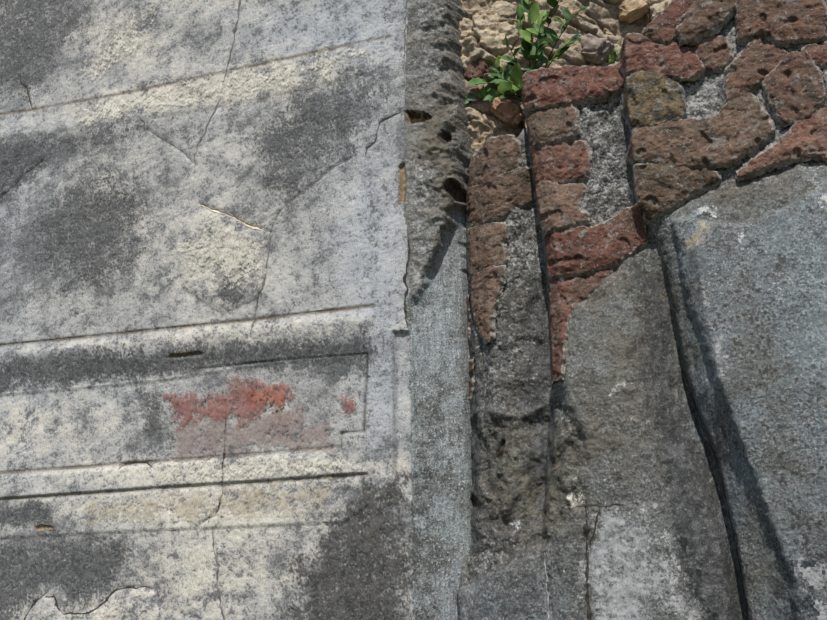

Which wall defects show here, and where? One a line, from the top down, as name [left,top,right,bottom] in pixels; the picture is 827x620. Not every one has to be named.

crack [149,0,241,174]
leakage [0,45,392,218]
leakage [23,163,154,317]
crack [200,162,344,334]
crack [24,586,155,620]
leakage [0,322,378,452]
crack [207,411,226,620]
peeling [162,375,335,461]
leakage [157,453,440,620]
peeling [339,394,357,414]
crack [574,503,623,620]
leakage [567,268,743,620]